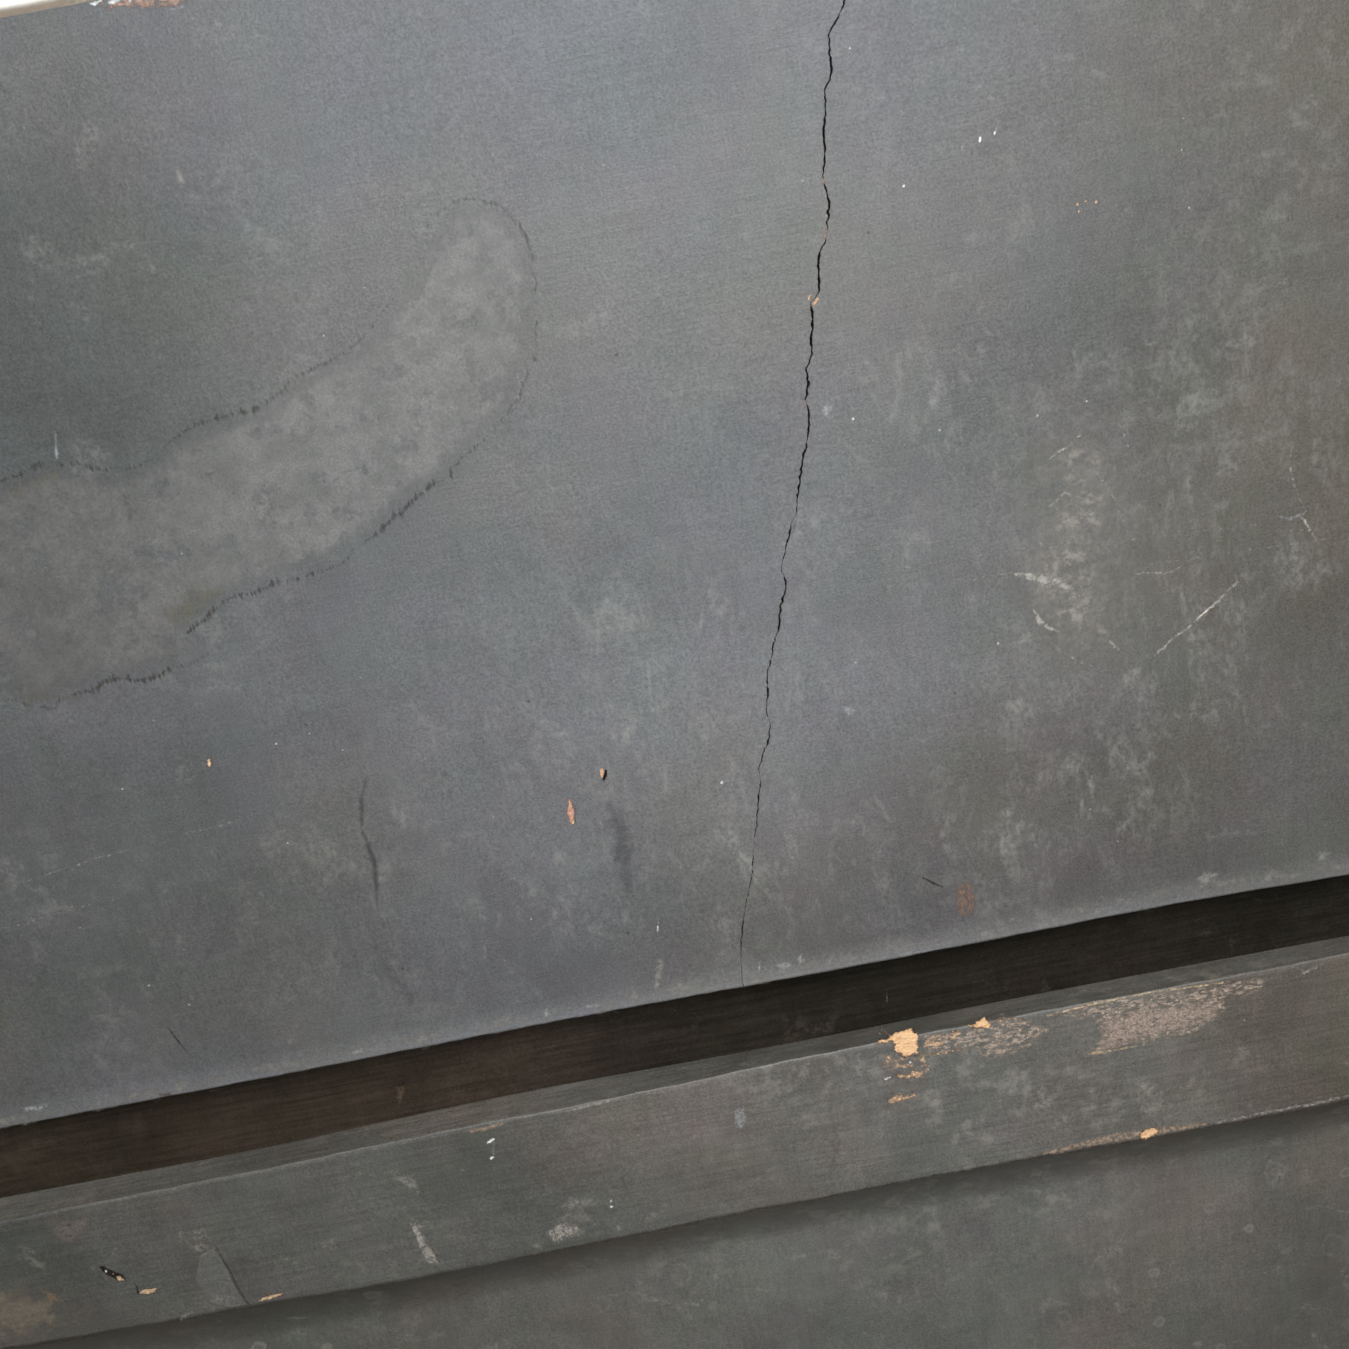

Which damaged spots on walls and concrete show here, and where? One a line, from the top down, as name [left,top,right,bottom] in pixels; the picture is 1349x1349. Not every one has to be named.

spalling [90,0,180,10]
water stain [0,202,528,700]
crack [740,0,845,984]
peeling [876,1017,1047,1104]
peeling [100,1266,159,1295]